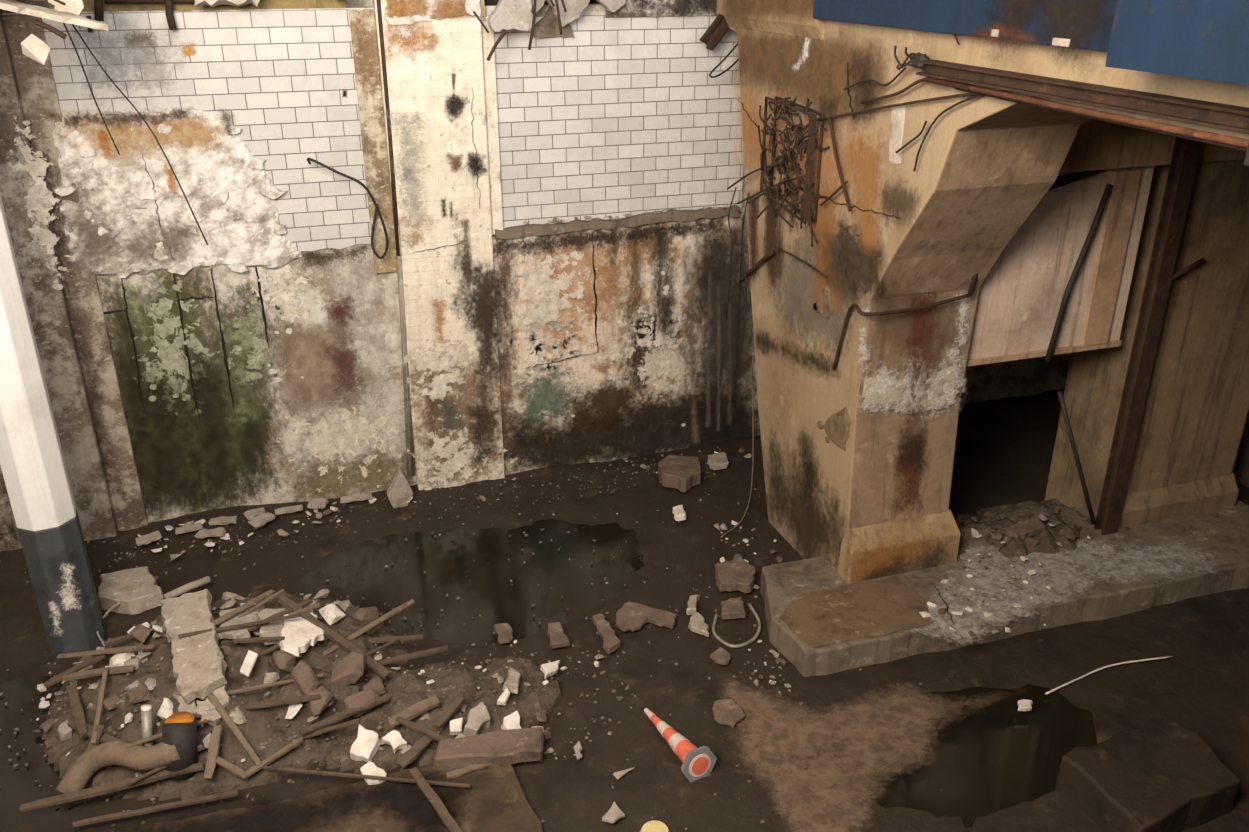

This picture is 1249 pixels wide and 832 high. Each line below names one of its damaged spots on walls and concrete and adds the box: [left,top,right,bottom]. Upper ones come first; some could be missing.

spalling [383,0,485,25]
flaking render [530,6,574,39]
spalling [605,0,717,18]
damp [402,227,761,489]
damp [118,316,267,508]
spalling [817,406,852,451]
peeling [862,366,959,414]